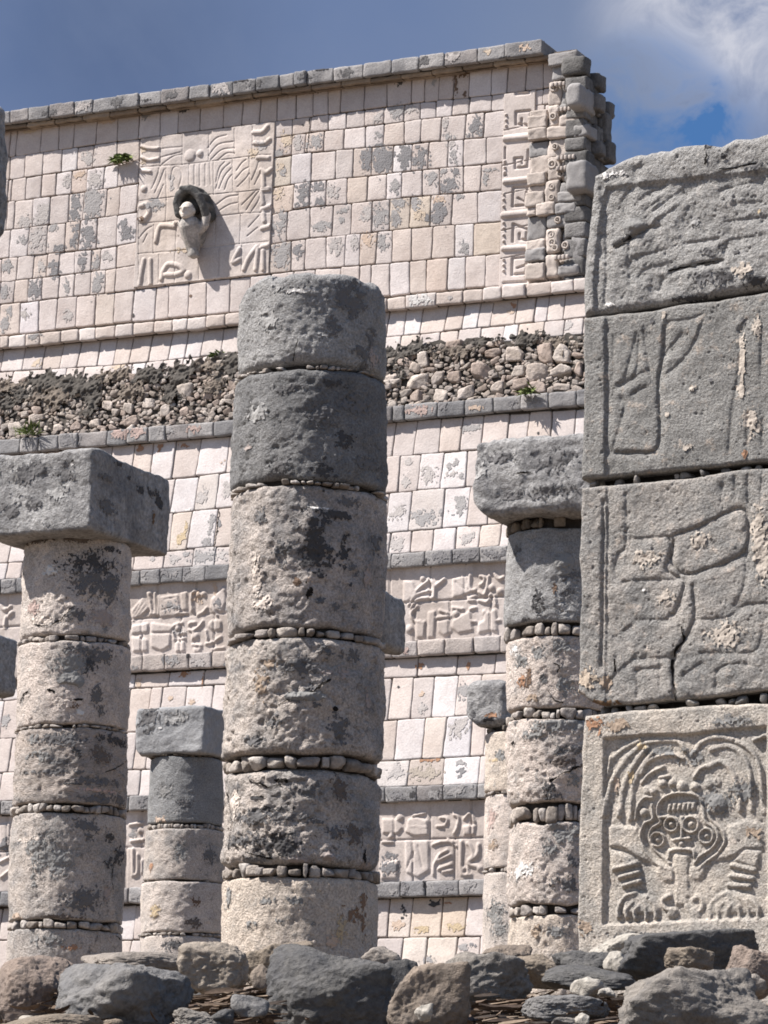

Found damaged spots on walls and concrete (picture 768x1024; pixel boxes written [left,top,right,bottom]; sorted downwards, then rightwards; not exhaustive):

crack [670,626,686,701]